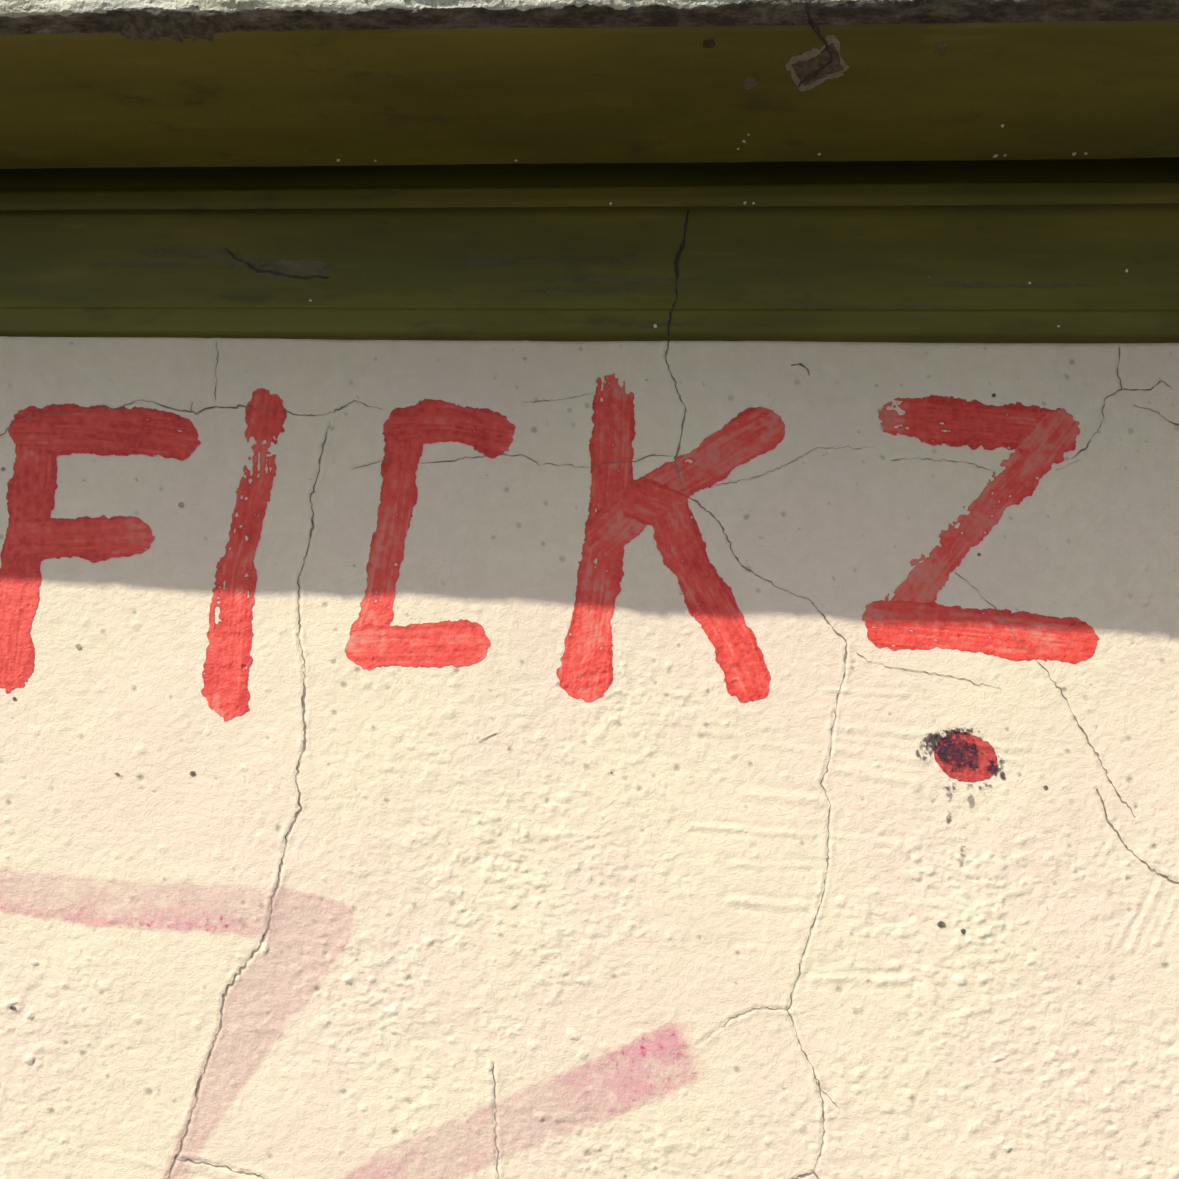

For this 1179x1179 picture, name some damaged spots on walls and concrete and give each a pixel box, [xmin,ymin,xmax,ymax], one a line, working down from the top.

spalling [785,34,850,92]
crack [804,0,833,60]
crack [1060,347,1179,469]
crack [0,342,383,1179]
crack [427,210,999,1179]
crack [955,573,1179,884]